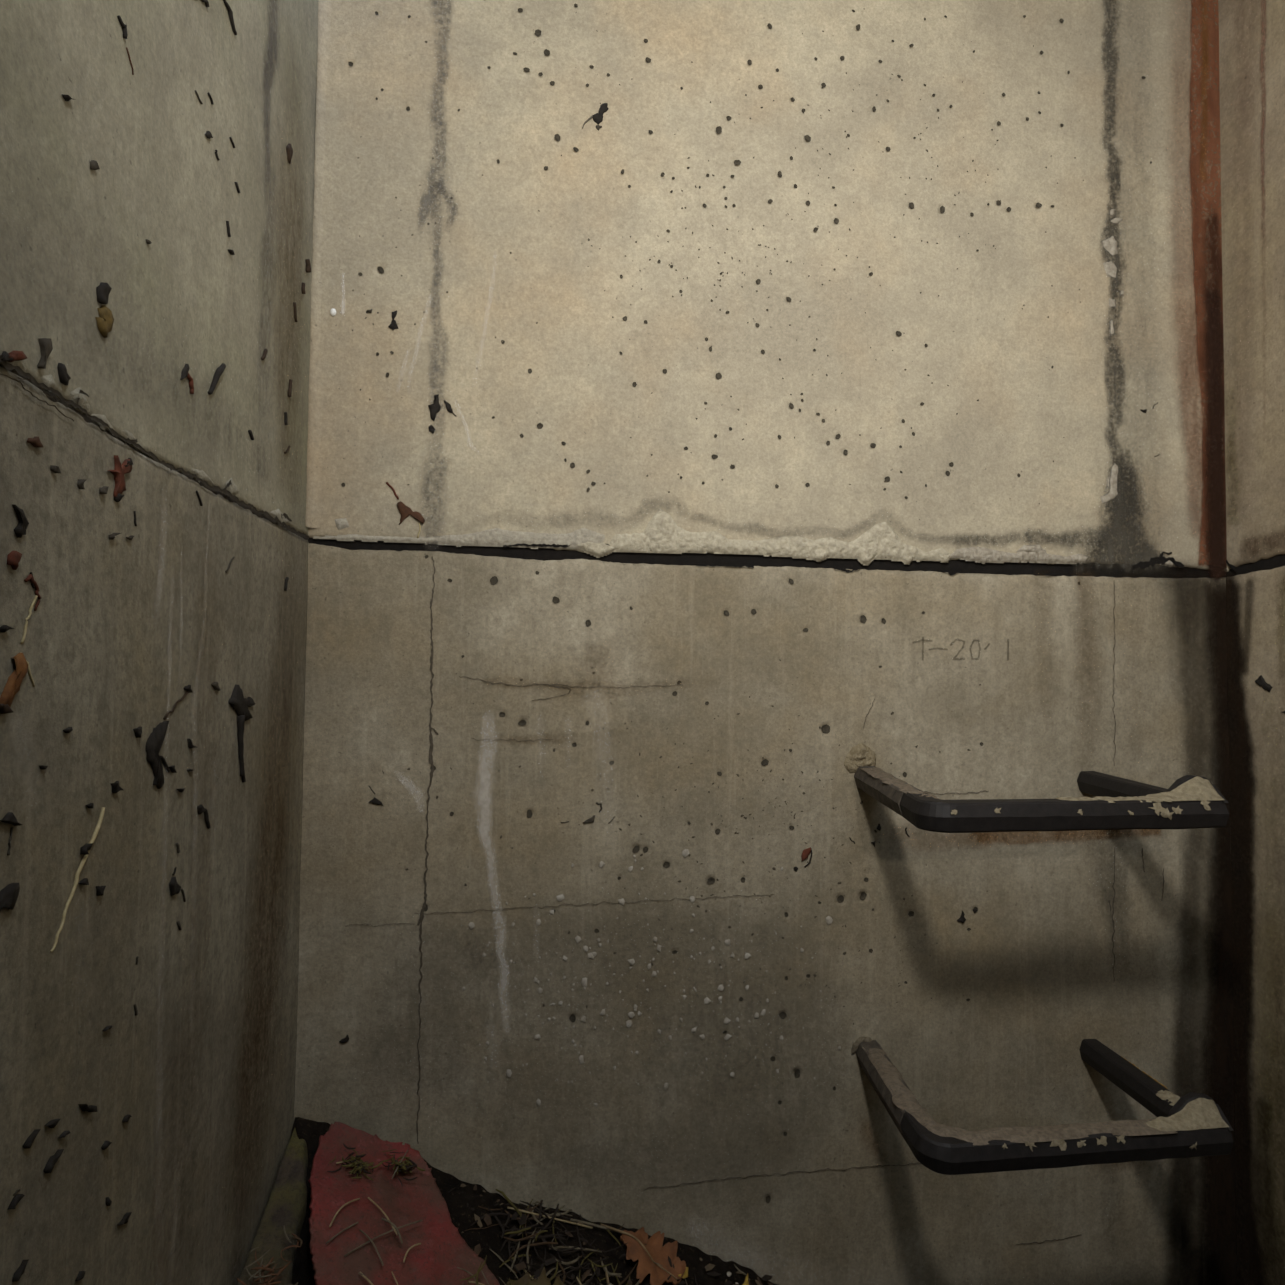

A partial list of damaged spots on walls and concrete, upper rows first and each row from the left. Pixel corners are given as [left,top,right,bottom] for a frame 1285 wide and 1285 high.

leakage [419,0,456,223]
crack [0,355,1285,1143]
leakage [956,536,996,545]
leakage [1025,0,1168,571]
corrosion [1182,0,1227,580]
leakage [1169,575,1276,1285]